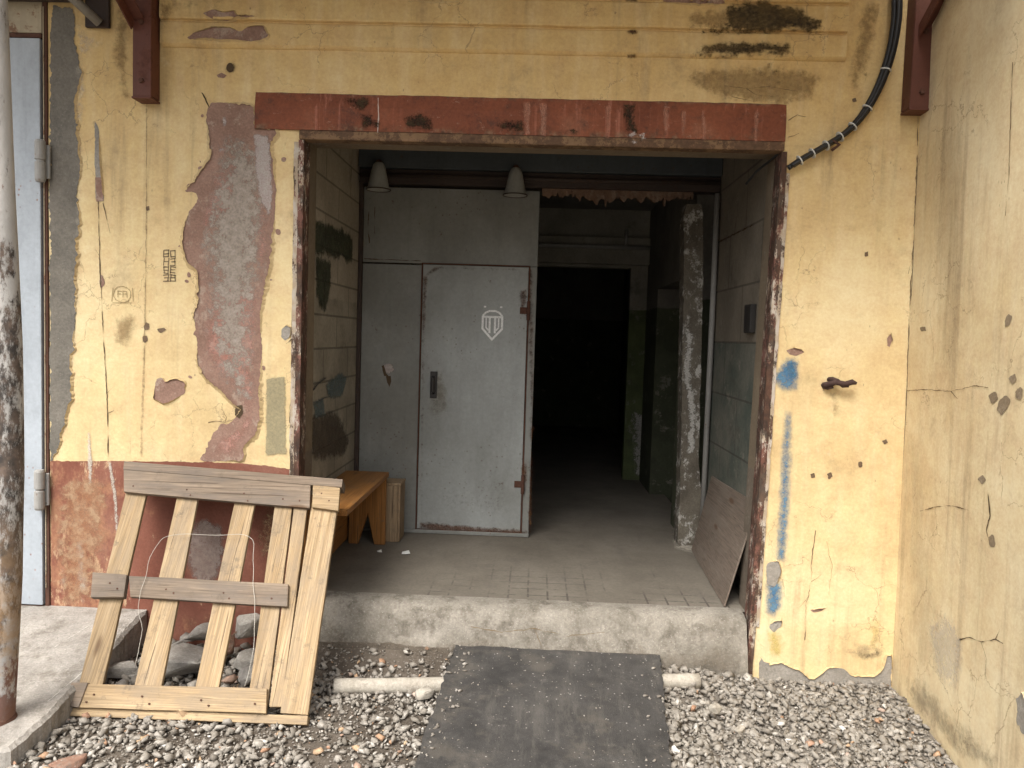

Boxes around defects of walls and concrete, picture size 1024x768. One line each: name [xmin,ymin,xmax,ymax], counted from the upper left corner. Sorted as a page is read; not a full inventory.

peeling [188,9,270,42]
damp [697,1,822,57]
peeling [73,200,83,311]
peeling [153,101,286,463]
damp [315,221,353,311]
crack [905,128,988,421]
peeling [53,331,77,458]
peeling [684,331,697,454]
peeling [989,374,1023,415]
crack [922,496,993,551]
crack [804,530,833,640]
peeling [759,654,893,687]